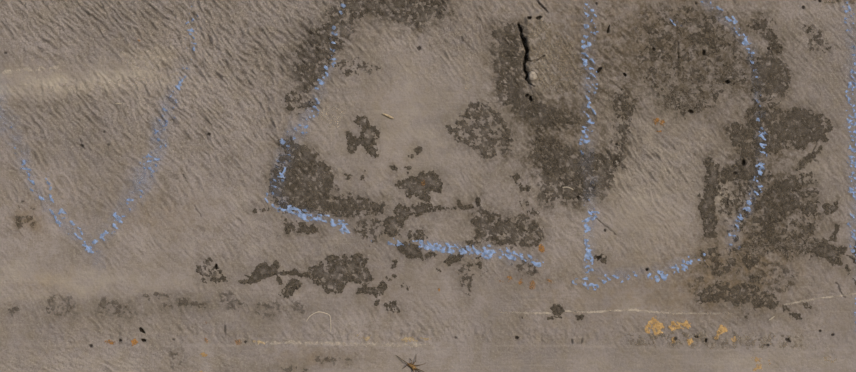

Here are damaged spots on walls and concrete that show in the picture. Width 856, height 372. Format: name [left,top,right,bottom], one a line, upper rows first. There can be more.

water stain [281,0,450,114]
water stain [196,23,635,313]
crack [517,24,529,80]
water stain [638,7,856,320]